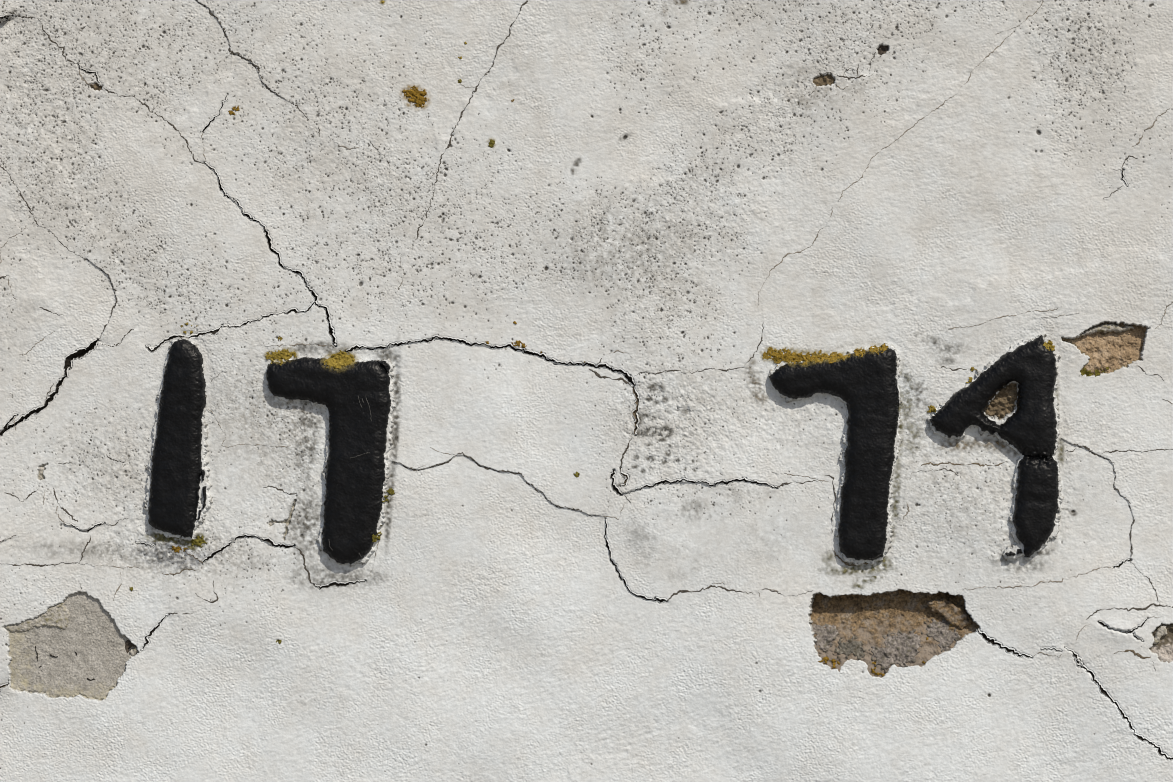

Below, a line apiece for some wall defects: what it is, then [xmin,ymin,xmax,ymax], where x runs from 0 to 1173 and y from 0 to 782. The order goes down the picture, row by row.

crack [1103,108,1170,199]
crack [0,0,1043,604]
crack [950,308,1078,329]
spalling [1062,322,1147,376]
spalling [4,592,139,700]
crack [0,462,379,652]
spalling [810,589,979,678]
crack [968,438,1173,761]
spalling [1150,624,1173,663]